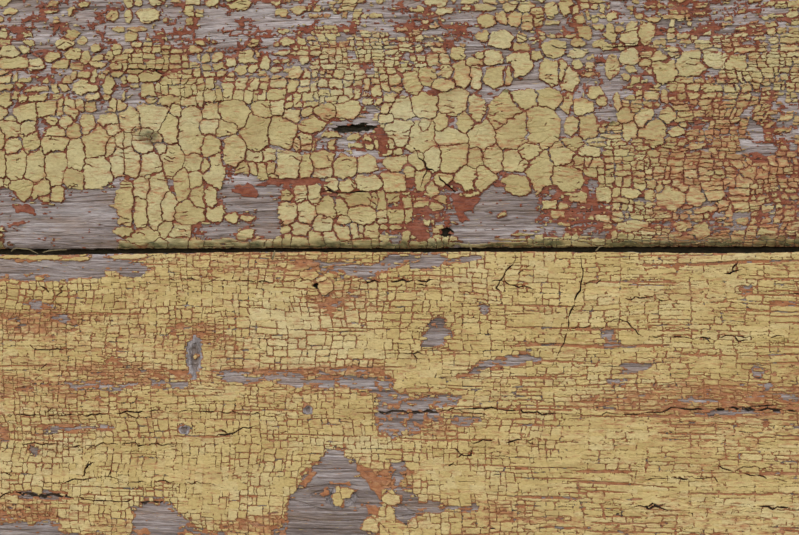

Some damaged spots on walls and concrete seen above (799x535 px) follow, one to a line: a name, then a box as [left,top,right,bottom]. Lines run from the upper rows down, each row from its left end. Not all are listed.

peeling [0,0,799,286]
crack [558,256,601,354]
peeling [419,312,455,351]
peeling [458,349,542,379]
crack [21,409,155,418]
peeling [202,360,488,443]
crack [379,407,568,415]
crack [602,405,797,416]
peeling [0,483,111,535]
crack [0,442,172,504]
peeling [127,445,571,535]
crack [638,502,666,510]